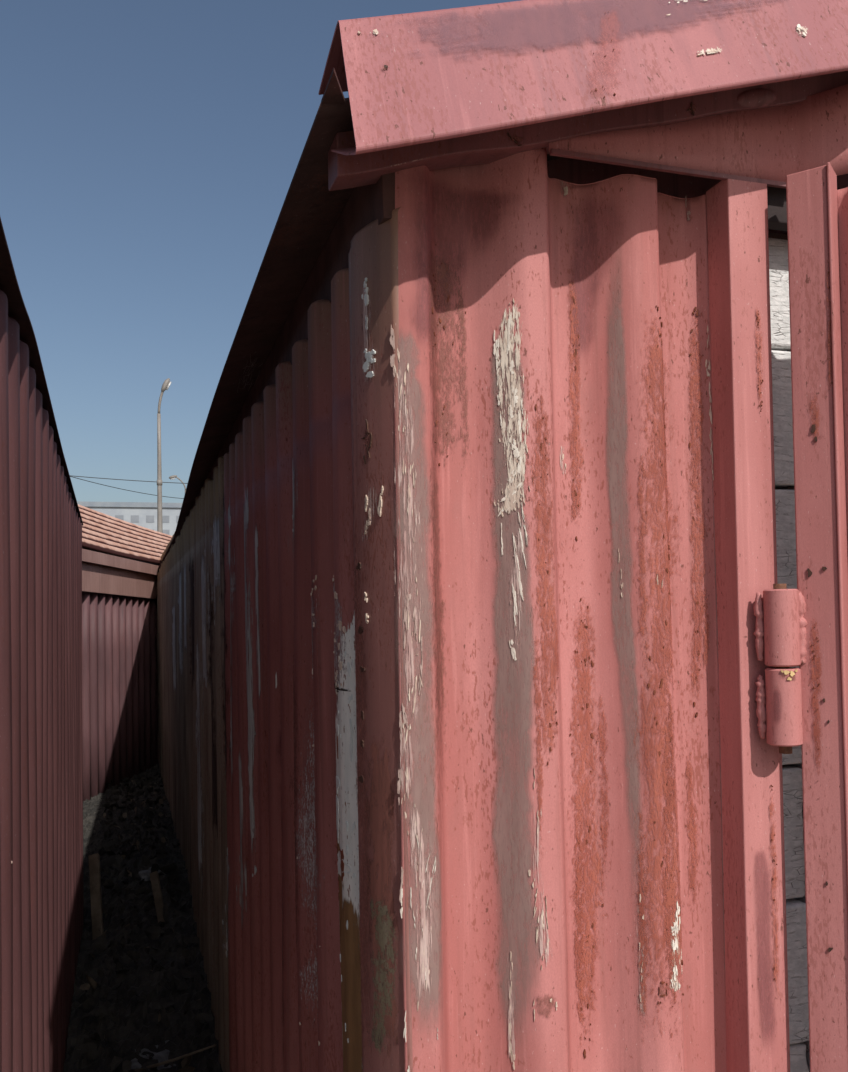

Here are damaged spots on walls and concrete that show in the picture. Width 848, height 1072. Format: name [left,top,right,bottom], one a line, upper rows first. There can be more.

leakage [427,0,744,50]
peeling [295,575,369,933]
rust [336,549,371,1072]
peeling [361,278,376,380]
peeling [362,325,423,848]
rust [424,244,469,738]
peeling [493,298,530,522]
rust [531,390,609,1059]
rust [568,281,584,521]
rust [631,305,709,1035]
peeling [670,901,682,992]